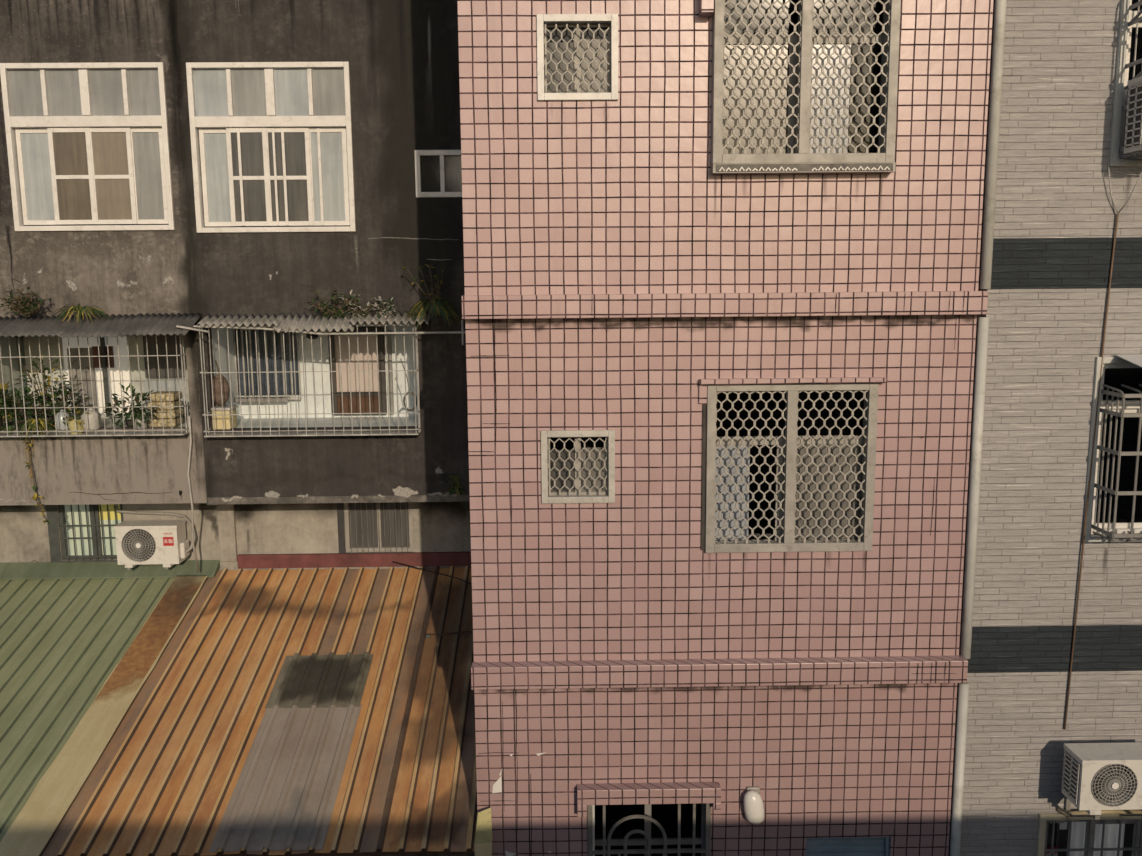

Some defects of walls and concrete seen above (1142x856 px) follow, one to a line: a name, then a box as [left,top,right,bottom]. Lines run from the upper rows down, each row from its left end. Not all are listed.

spalling [378,467,460,498]